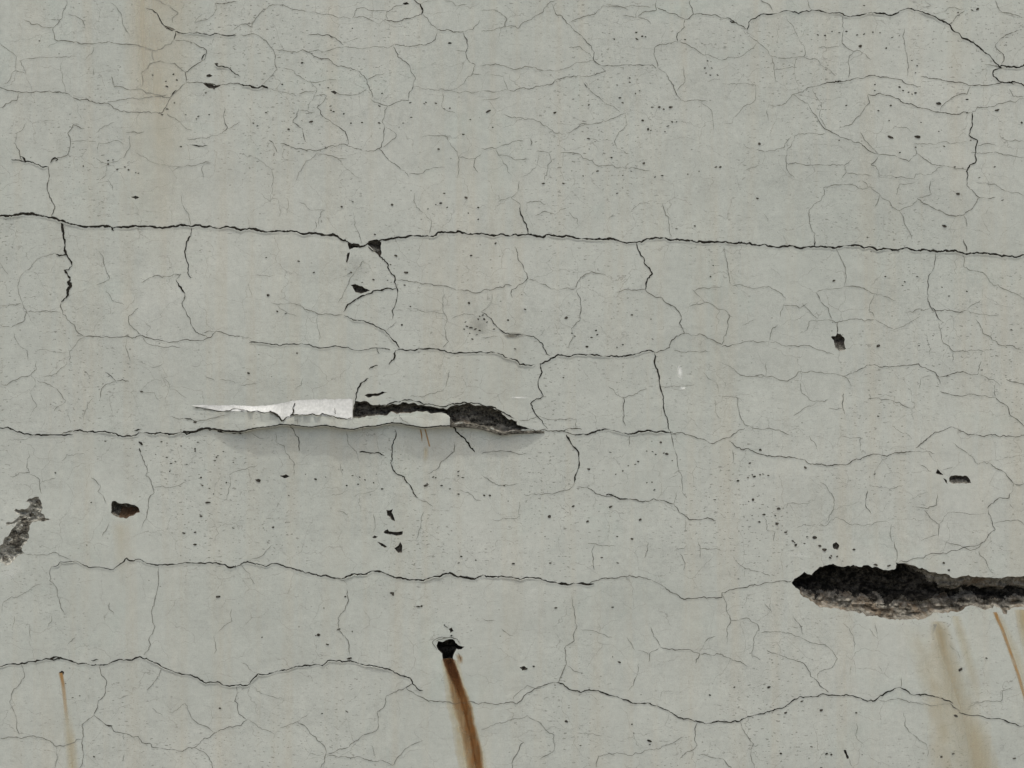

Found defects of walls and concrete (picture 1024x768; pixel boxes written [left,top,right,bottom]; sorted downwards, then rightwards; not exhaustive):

crack [0,0,1024,573]
peeling [831,333,846,351]
spalling [192,392,528,432]
spalling [0,497,50,565]
peeling [111,501,140,519]
spalling [752,507,1024,620]
crack [0,543,1019,768]
rust [994,612,1024,695]
rust [443,657,482,768]